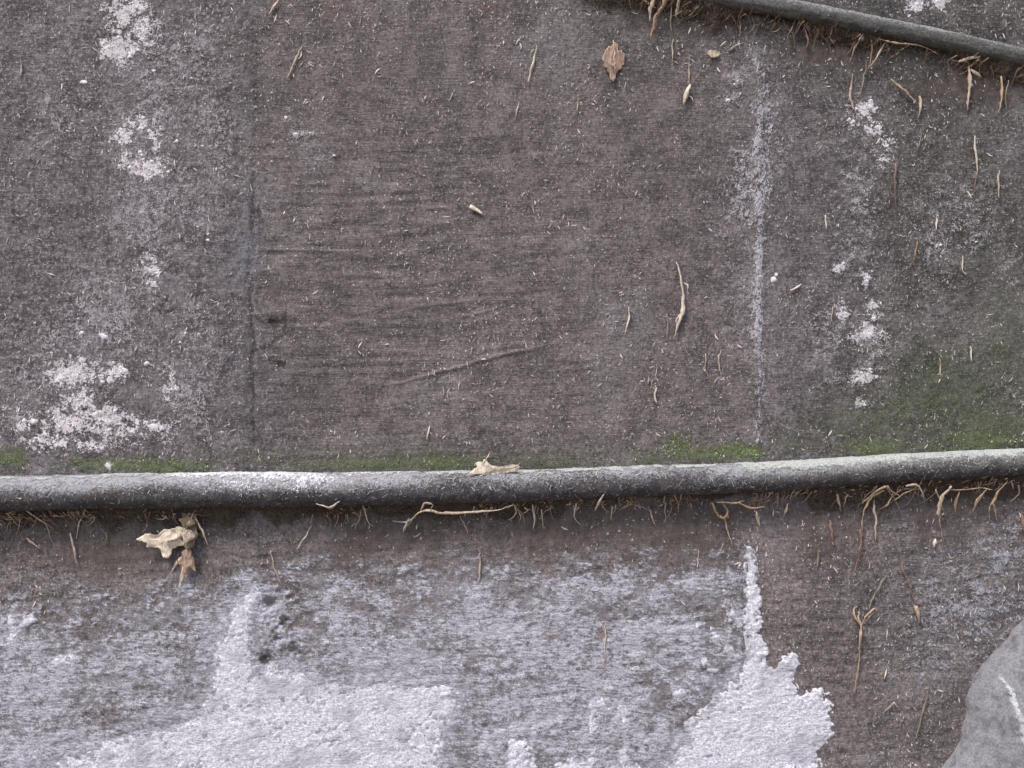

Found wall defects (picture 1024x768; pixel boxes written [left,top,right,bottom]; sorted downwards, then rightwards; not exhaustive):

damp [0,0,499,495]
damp [707,45,797,441]
damp [801,93,900,409]